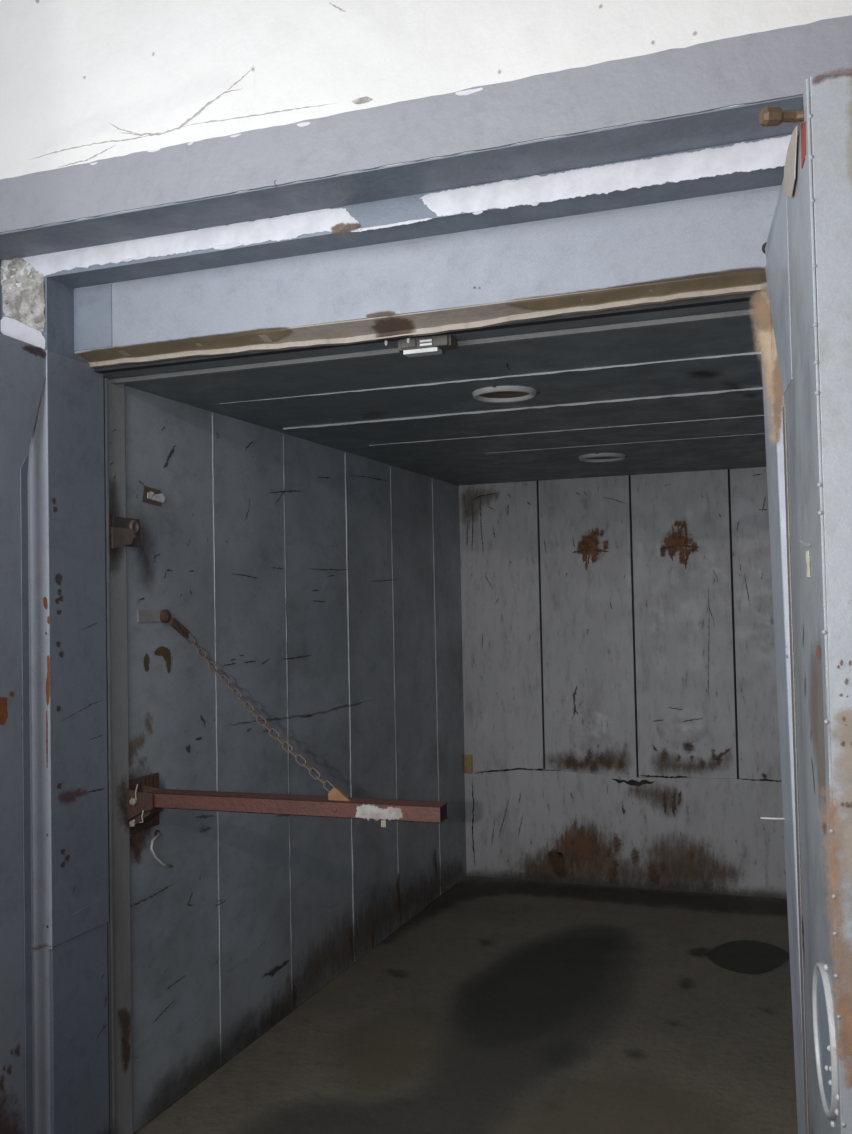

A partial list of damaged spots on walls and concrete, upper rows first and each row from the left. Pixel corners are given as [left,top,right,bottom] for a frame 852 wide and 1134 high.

crack [29,65,335,167]
peeling [0,134,798,349]
corrosion [572,529,609,570]
corrosion [660,521,700,569]
corrosion [0,691,14,725]
corrosion [551,750,626,772]
corrosion [653,743,730,770]
corrosion [527,824,737,890]